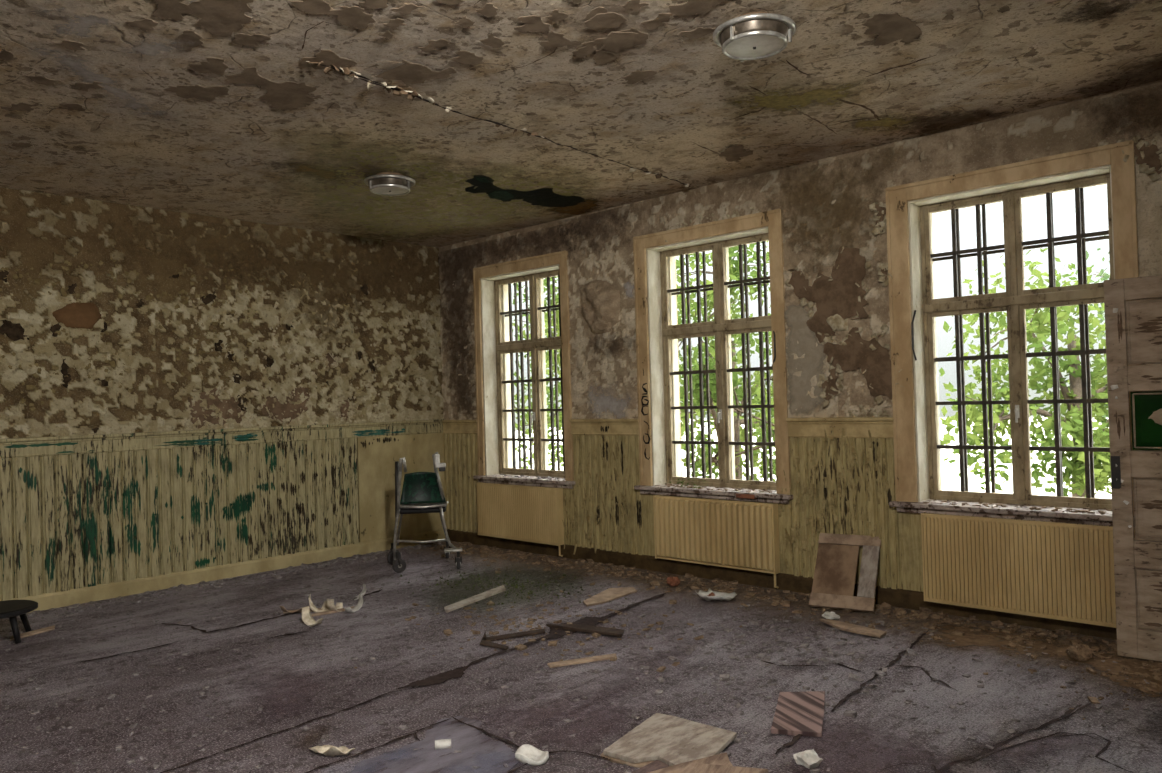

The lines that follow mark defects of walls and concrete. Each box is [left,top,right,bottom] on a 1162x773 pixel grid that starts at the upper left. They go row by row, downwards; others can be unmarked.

peeling [125,0,319,110]
peeling [290,0,421,38]
peeling [301,33,504,88]
peeling [514,0,726,63]
peeling [862,13,922,45]
crack [302,21,691,187]
peeling [719,145,753,162]
peeling [1122,135,1162,181]
peeling [778,166,903,576]
crack [759,630,957,712]
crack [775,734,804,754]
crack [888,702,1133,773]